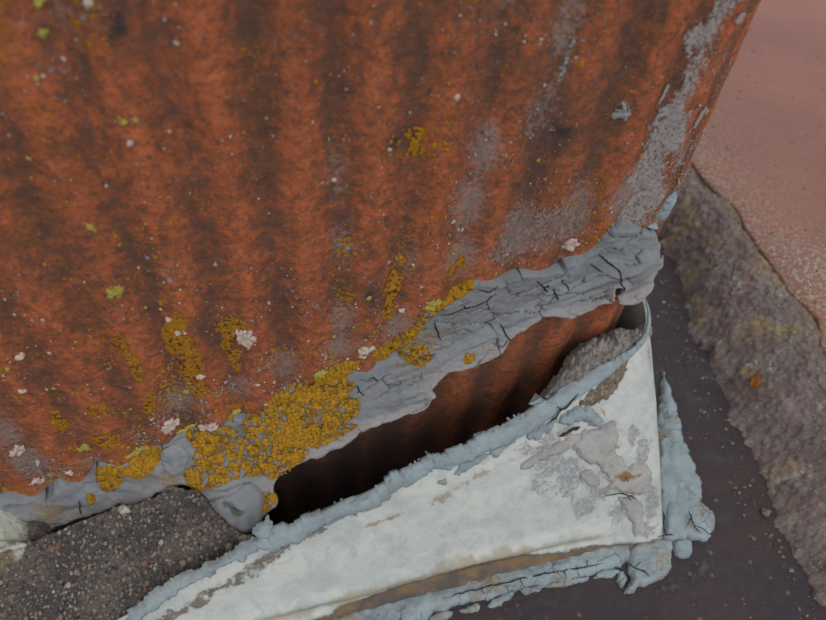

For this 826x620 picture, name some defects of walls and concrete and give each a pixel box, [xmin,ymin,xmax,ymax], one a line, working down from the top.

crack [537,280,569,301]
crack [590,254,626,296]
crack [434,286,511,341]
crack [658,512,713,537]
crack [444,560,603,598]